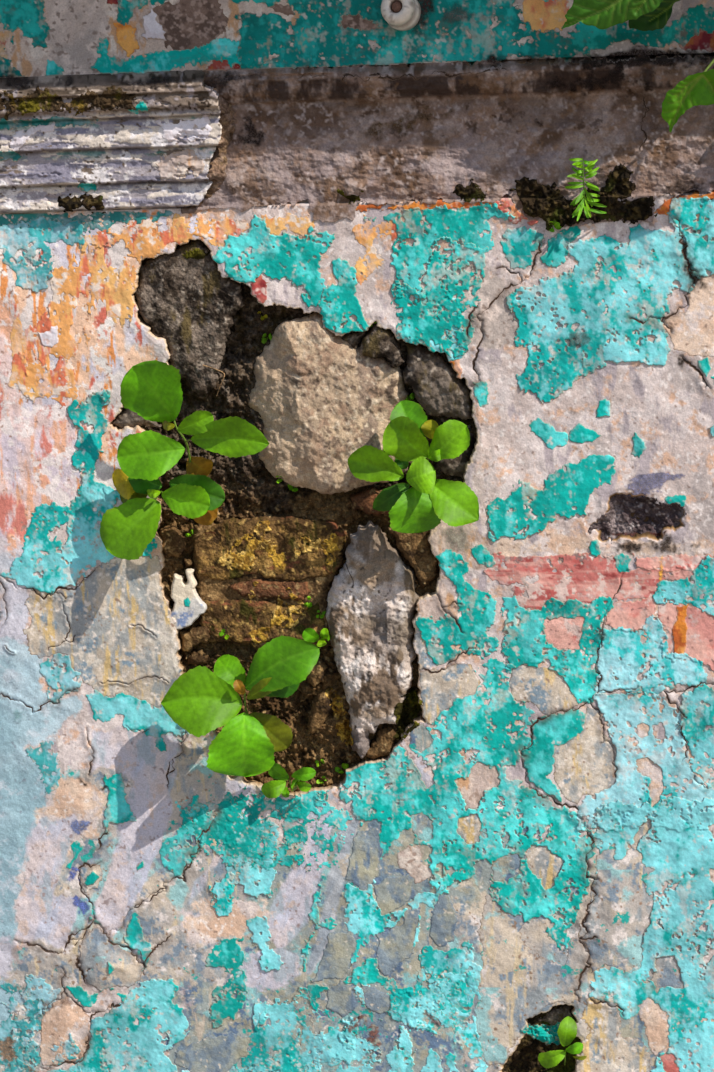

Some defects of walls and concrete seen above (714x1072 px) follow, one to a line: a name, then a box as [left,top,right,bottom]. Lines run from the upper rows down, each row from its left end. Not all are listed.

peeling [90,0,714,75]
peeling [128,101,213,181]
crack [466,242,542,379]
crack [630,219,697,331]
crack [681,356,710,388]
peeling [0,190,714,752]
peeling [26,741,64,795]
crack [166,732,186,787]
peeling [47,494,714,1072]
crack [521,572,637,1015]
crack [18,814,217,1070]
peeling [0,974,102,1072]